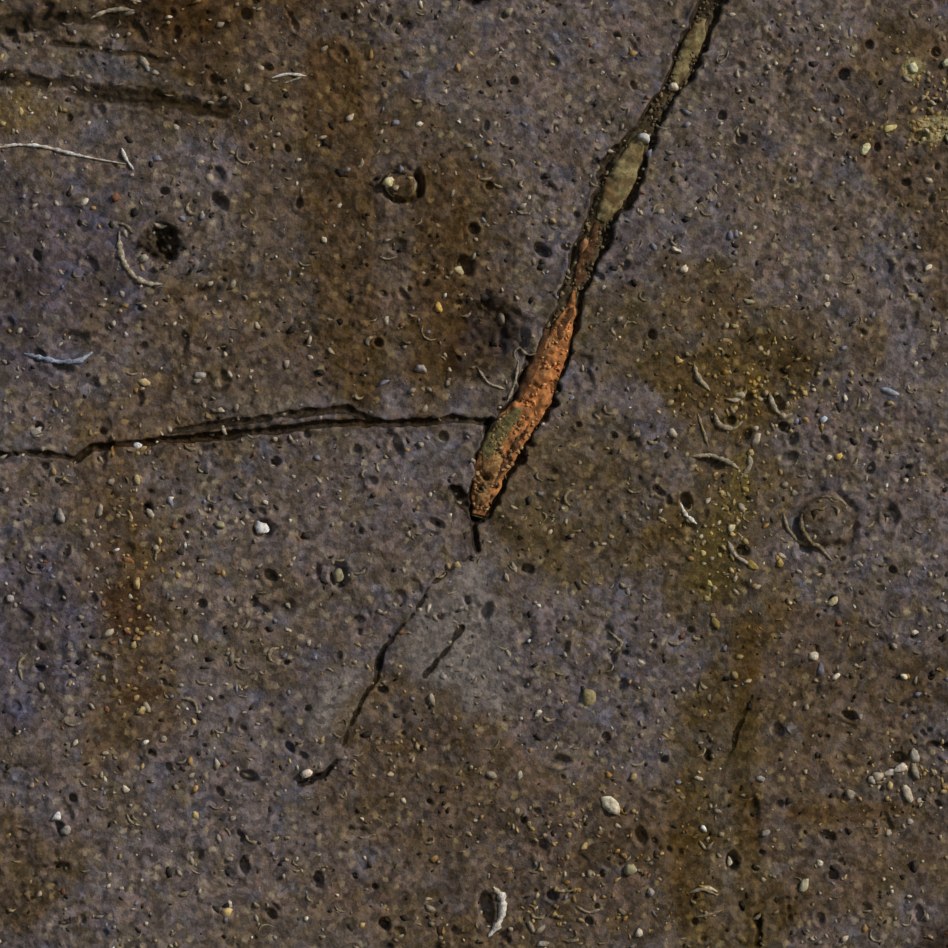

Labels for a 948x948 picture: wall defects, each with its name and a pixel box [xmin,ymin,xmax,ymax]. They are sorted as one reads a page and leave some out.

crack [0,0,728,787]
rust [471,290,576,516]
crack [731,695,754,753]